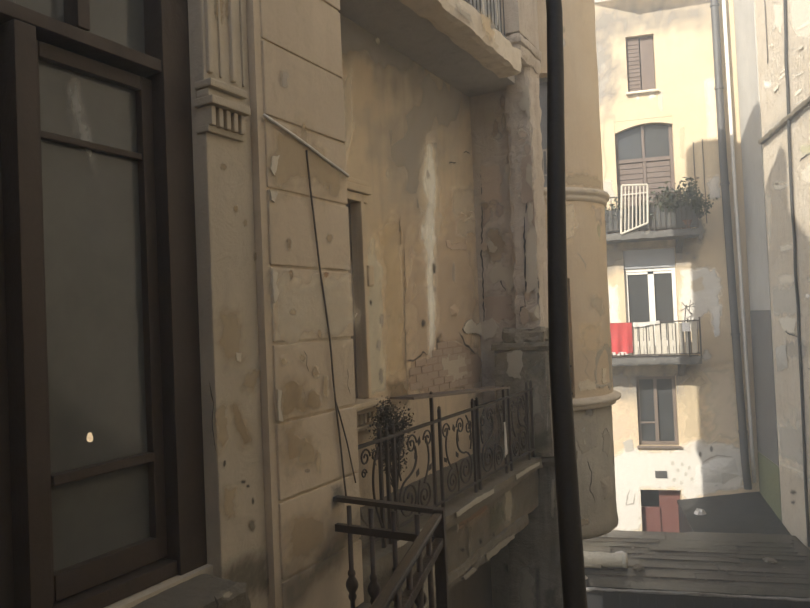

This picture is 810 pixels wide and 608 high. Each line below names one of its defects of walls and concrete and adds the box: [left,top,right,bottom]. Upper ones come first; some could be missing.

peeling [774,0,810,36]
peeling [520,144,539,305]
peeling [691,276,705,293]
peeling [506,350,523,379]
peeling [574,421,611,457]
peeling [671,462,720,489]